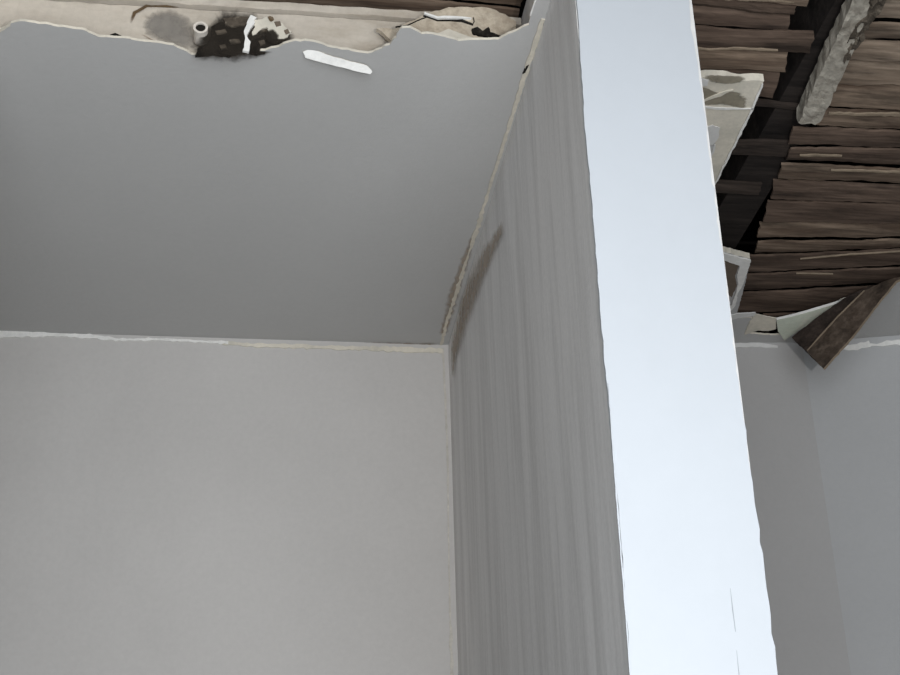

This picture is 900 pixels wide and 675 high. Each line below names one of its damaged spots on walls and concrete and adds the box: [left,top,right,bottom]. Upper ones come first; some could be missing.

damp [131,5,194,47]
peeling [243,15,292,54]
flaking render [376,7,516,43]
spalling [843,0,886,64]
peeling [303,50,372,74]
peeling [701,70,764,185]
flaking render [723,246,776,335]